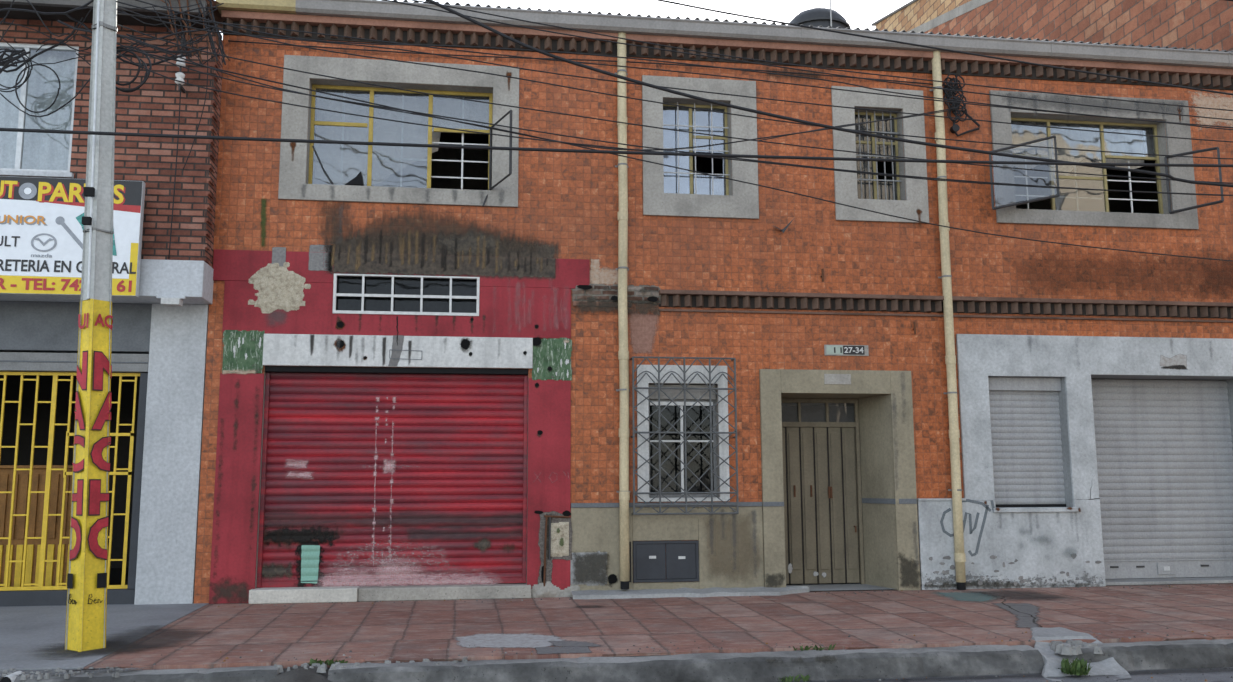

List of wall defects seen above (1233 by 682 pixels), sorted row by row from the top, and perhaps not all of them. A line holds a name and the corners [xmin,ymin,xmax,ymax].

flaking render [248,262,311,313]
peeling [222,330,265,374]
peeling [320,397,496,587]
crack [993,598,1043,628]